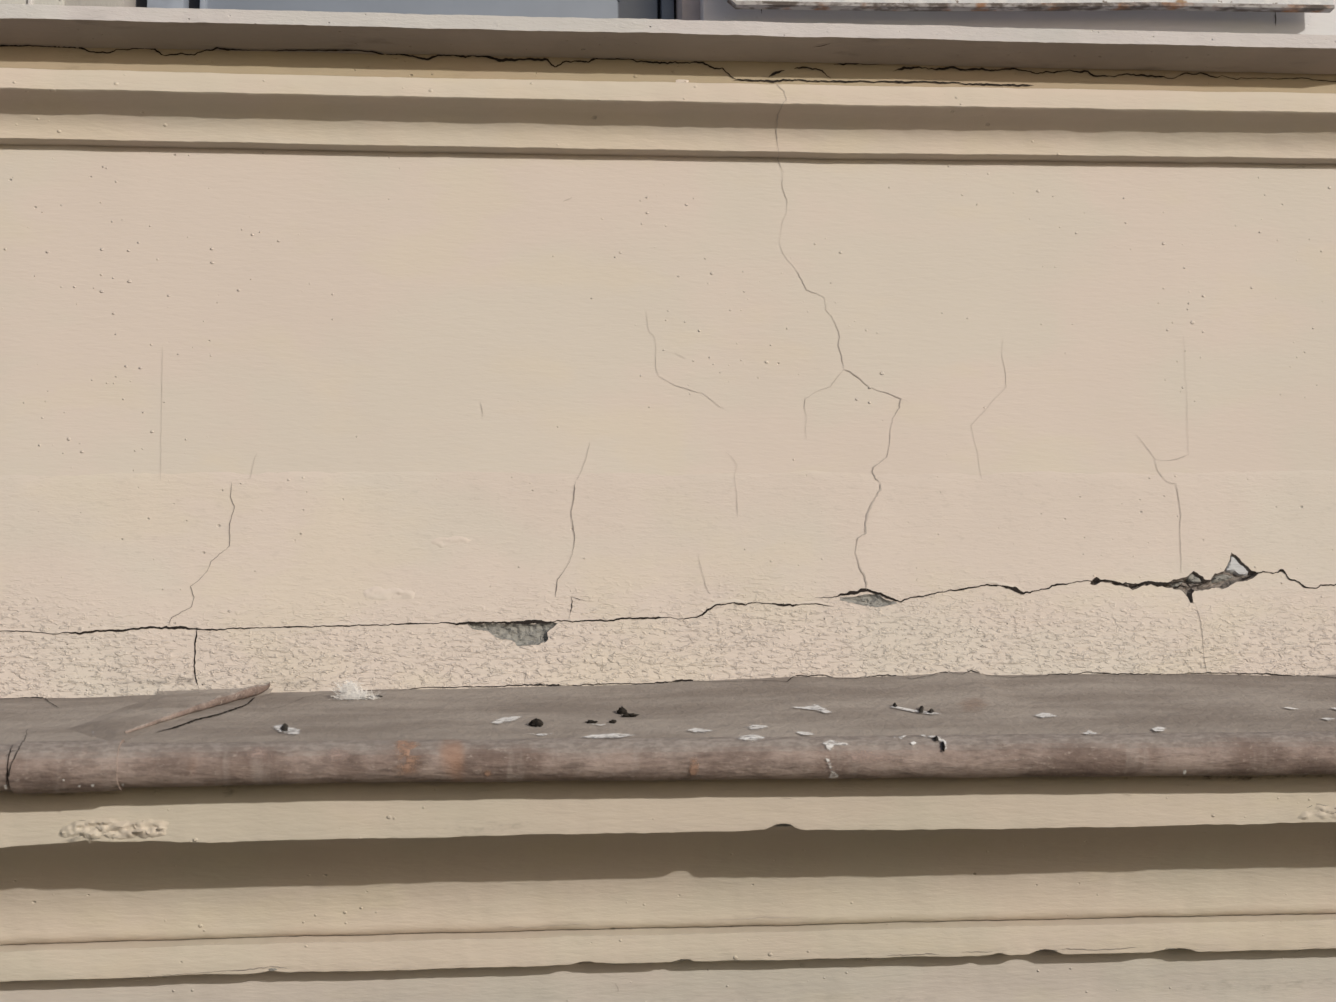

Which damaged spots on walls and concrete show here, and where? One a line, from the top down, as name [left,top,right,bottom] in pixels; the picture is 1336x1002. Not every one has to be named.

crack [0,45,1336,685]
spalling [840,594,896,607]
spalling [1090,552,1258,603]
spalling [468,623,557,646]
crack [277,661,699,708]